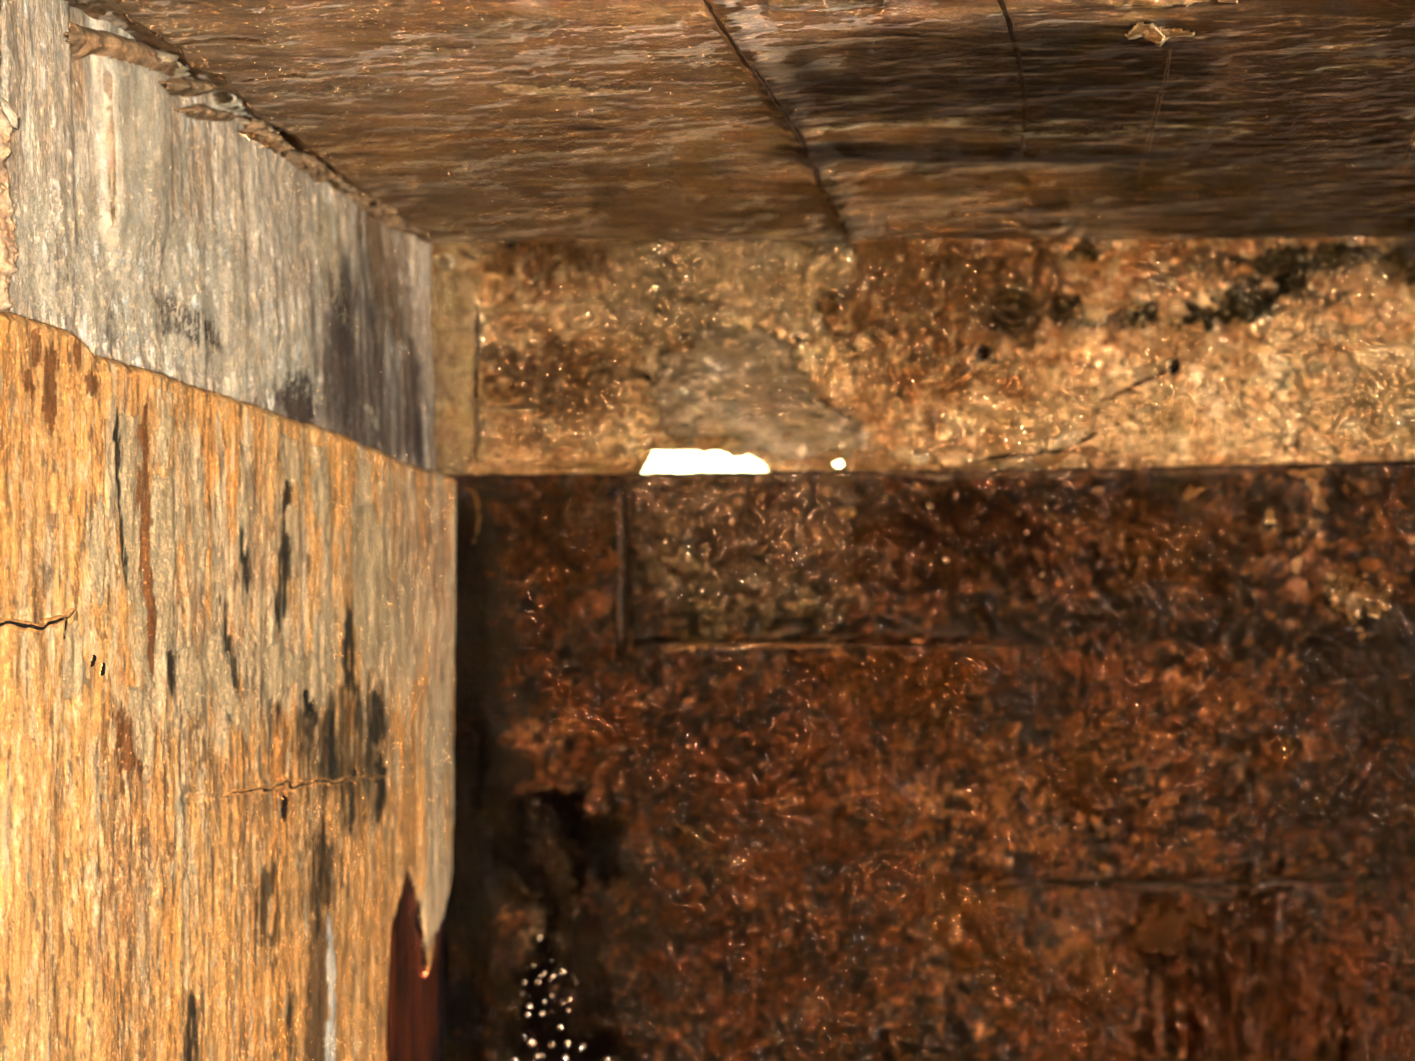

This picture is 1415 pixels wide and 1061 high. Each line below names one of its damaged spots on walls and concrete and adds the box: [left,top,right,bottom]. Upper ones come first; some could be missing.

crack [703,0,848,235]
crack [997,0,1028,151]
spalling [1093,0,1238,47]
mould [1115,305,1156,329]
mould [1177,239,1386,332]
rust [24,328,98,435]
spalling [854,427,1151,471]
rust [136,404,157,676]
crack [0,608,76,639]
rust [115,701,142,794]
leakage [276,603,387,835]
leakage [287,817,342,1061]